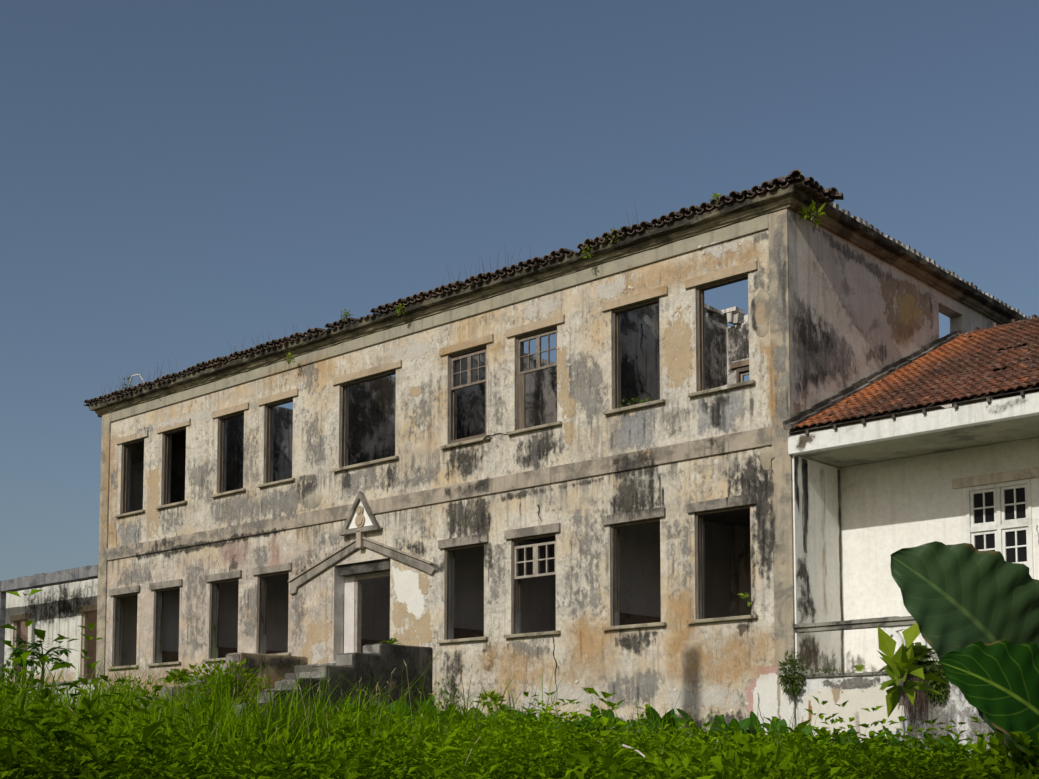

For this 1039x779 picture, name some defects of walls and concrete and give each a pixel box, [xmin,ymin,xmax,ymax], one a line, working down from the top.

peeling [661,304,695,388]
peeling [878,271,933,346]
damp [25,584,95,624]
damp [105,407,325,650]
peeling [391,566,435,646]
damp [339,369,545,603]
damp [516,353,608,470]
damp [615,631,657,654]
damp [564,322,753,613]
damp [726,455,775,636]
damp [754,226,900,623]
damp [896,684,993,750]